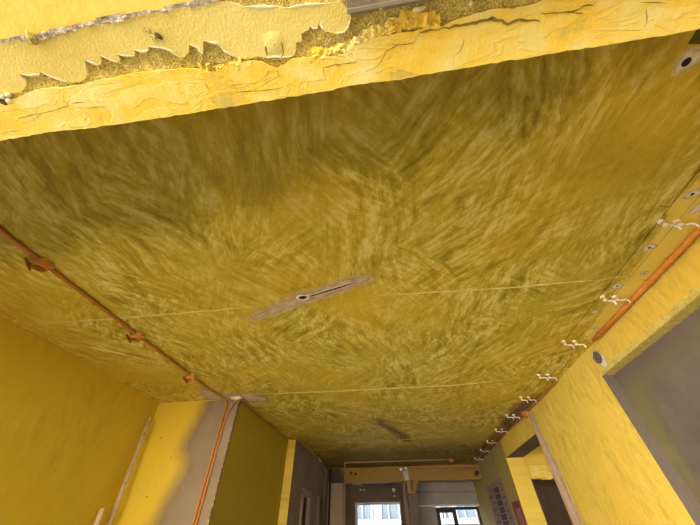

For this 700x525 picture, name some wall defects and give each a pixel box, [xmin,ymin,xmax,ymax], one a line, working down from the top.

crack [1,98,105,134]
crack [229,71,283,94]
flaking render [0,0,539,105]
crack [366,4,594,72]